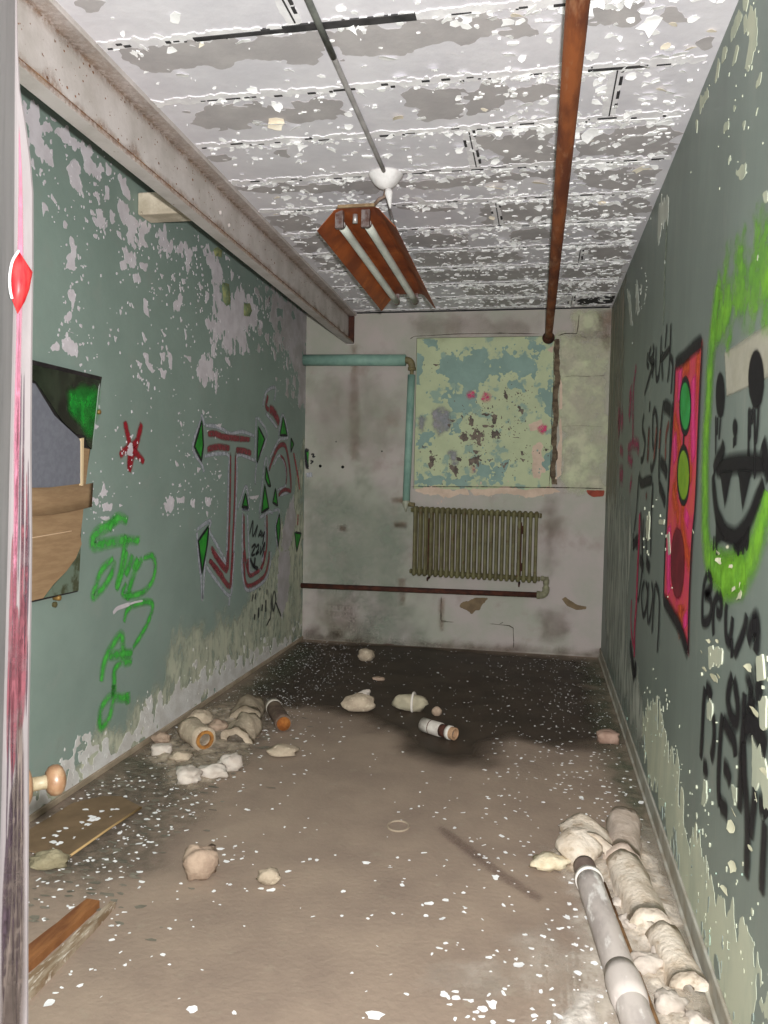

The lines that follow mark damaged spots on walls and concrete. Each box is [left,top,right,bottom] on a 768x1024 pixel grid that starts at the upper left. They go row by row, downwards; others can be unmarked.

peeling [74,0,105,13]
peeling [23,100,307,414]
peeling [113,0,565,311]
peeling [29,443,317,815]
peeling [161,398,225,527]
damp [253,614,607,762]
peeling [414,0,768,1024]